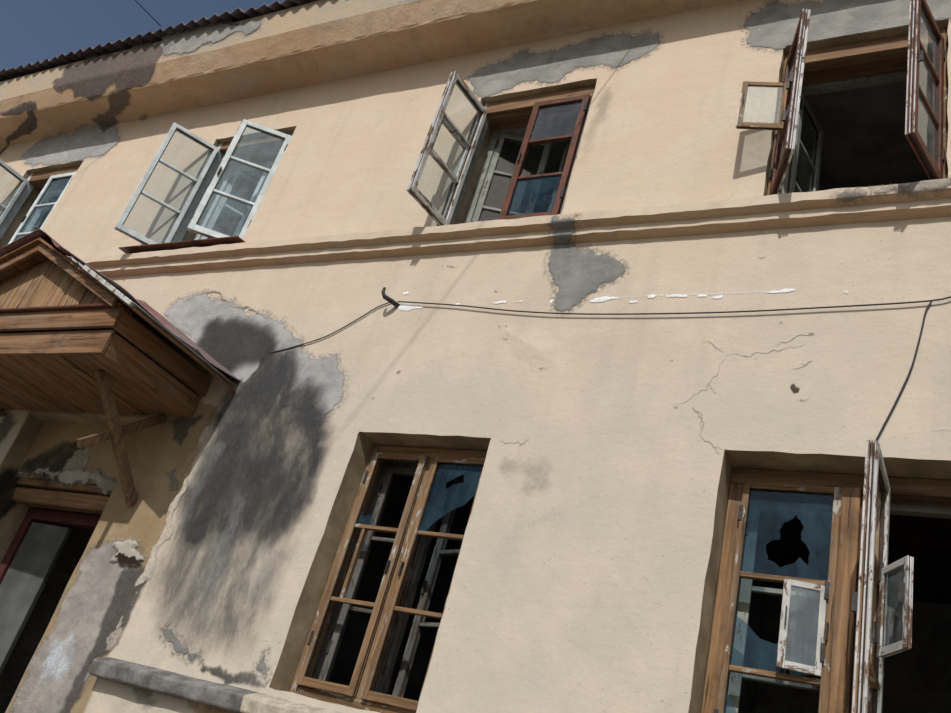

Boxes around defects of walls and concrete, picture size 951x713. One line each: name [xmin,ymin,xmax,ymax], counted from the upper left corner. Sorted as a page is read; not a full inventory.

water stain [0,101,37,155]
crack [682,334,813,454]
water stain [165,473,284,635]